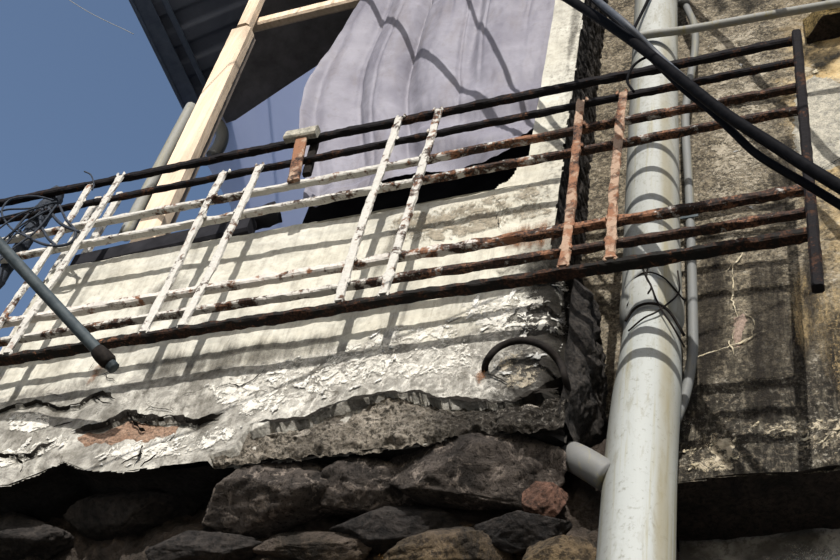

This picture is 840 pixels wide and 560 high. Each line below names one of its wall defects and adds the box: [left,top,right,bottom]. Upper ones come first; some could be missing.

water stain [772,158,795,187]
peeling [792,116,801,154]
peeling [805,64,840,170]
peeling [0,412,67,467]
crack [0,362,264,472]
spalling [78,292,569,469]
water stain [698,256,727,385]
water stain [747,252,840,417]